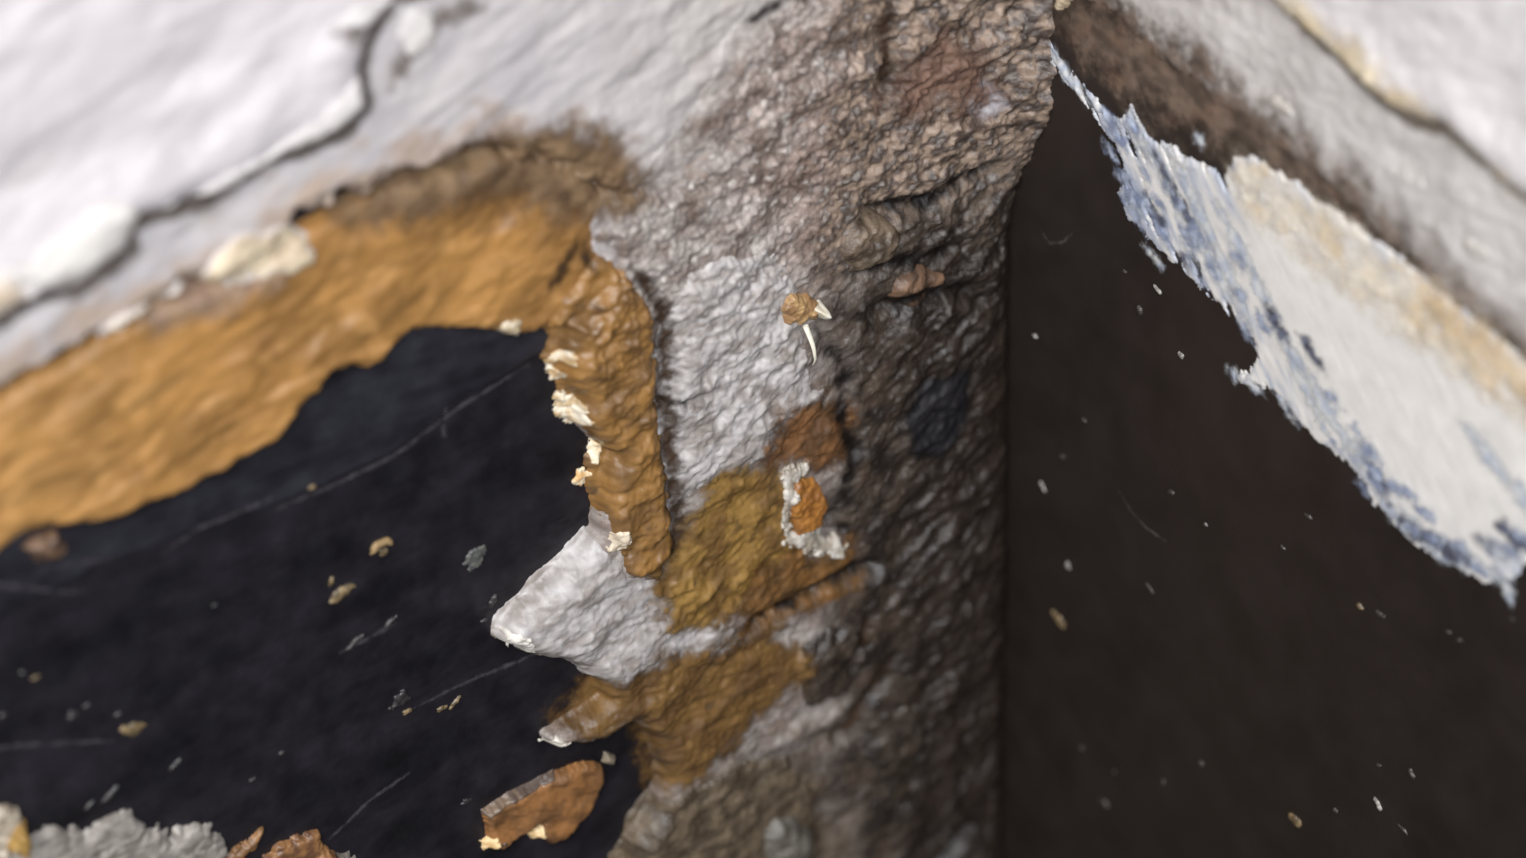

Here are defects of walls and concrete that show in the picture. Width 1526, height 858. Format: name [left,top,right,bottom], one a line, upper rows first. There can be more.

crack [0,0,476,328]
peeling [0,0,1057,858]
water stain [906,369,970,458]
peeling [1267,94,1294,117]
water stain [1231,162,1526,420]
water stain [1275,0,1517,195]
crack [1282,9,1526,200]
rust [550,390,863,790]